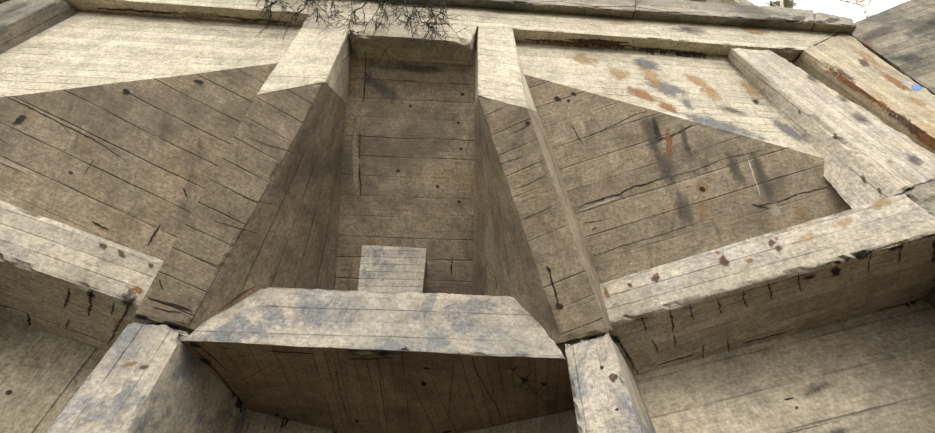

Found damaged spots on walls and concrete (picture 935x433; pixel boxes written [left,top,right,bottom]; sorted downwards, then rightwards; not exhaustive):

crack [546,266,563,310]
crack [876,298,931,311]
crack [0,305,107,343]